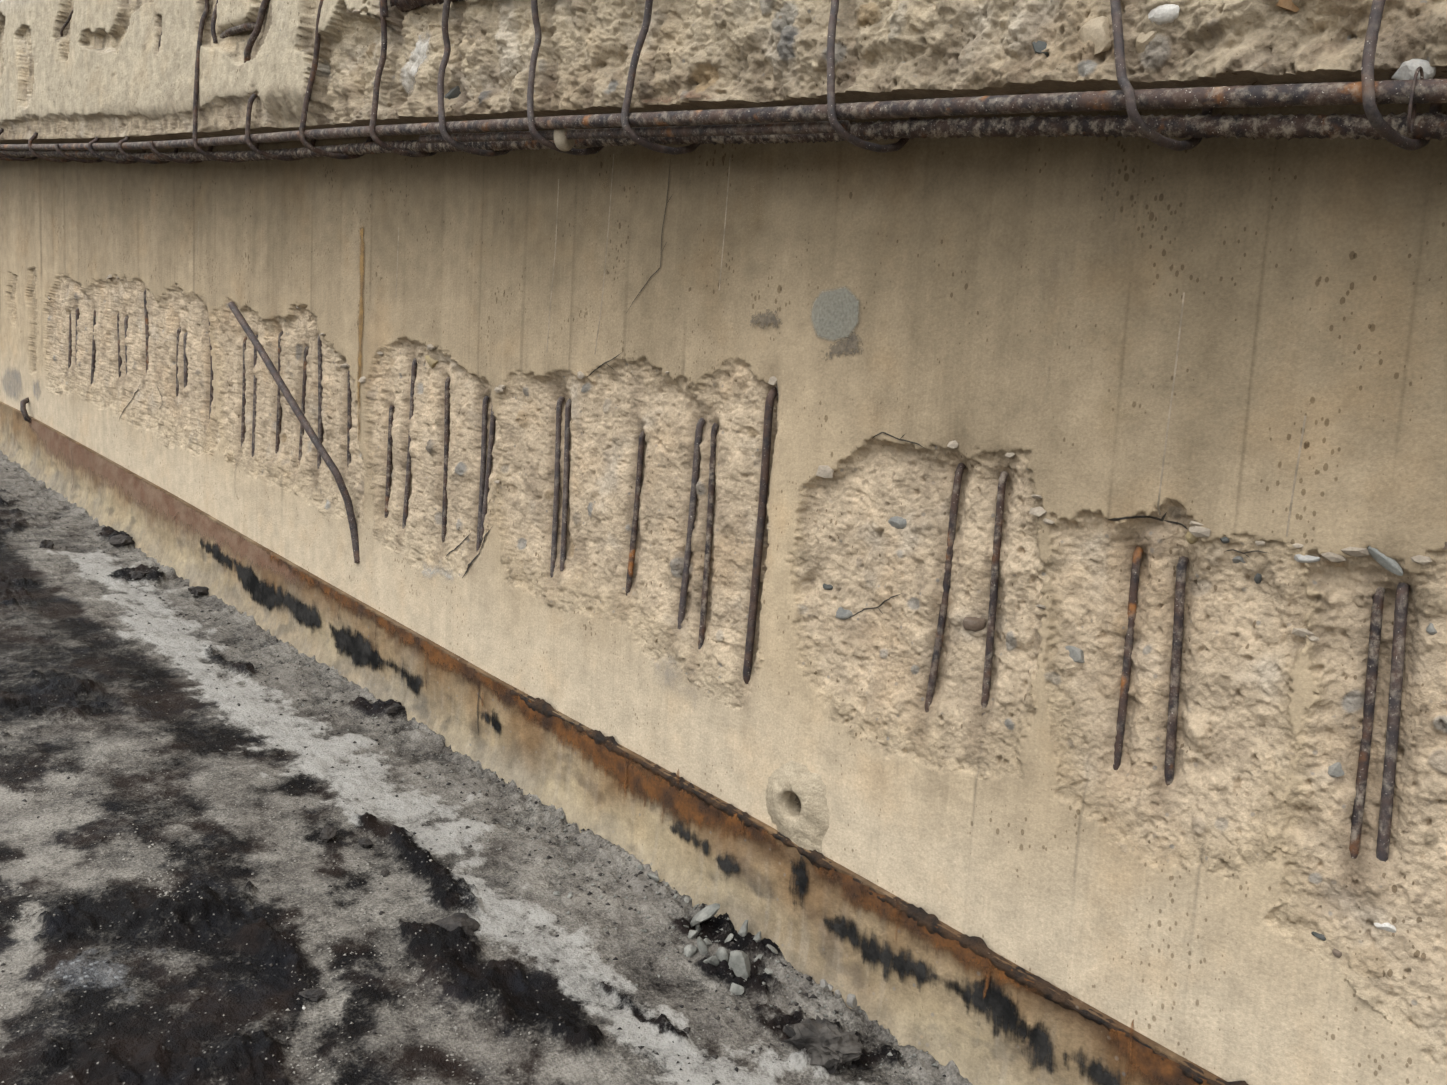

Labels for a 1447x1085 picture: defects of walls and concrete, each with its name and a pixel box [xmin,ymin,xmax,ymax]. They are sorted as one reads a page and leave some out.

spalling [0,0,1447,161]
spalling [7,267,782,710]
rust [29,419,776,847]
spalling [825,332,863,361]
spalling [786,437,1447,1069]